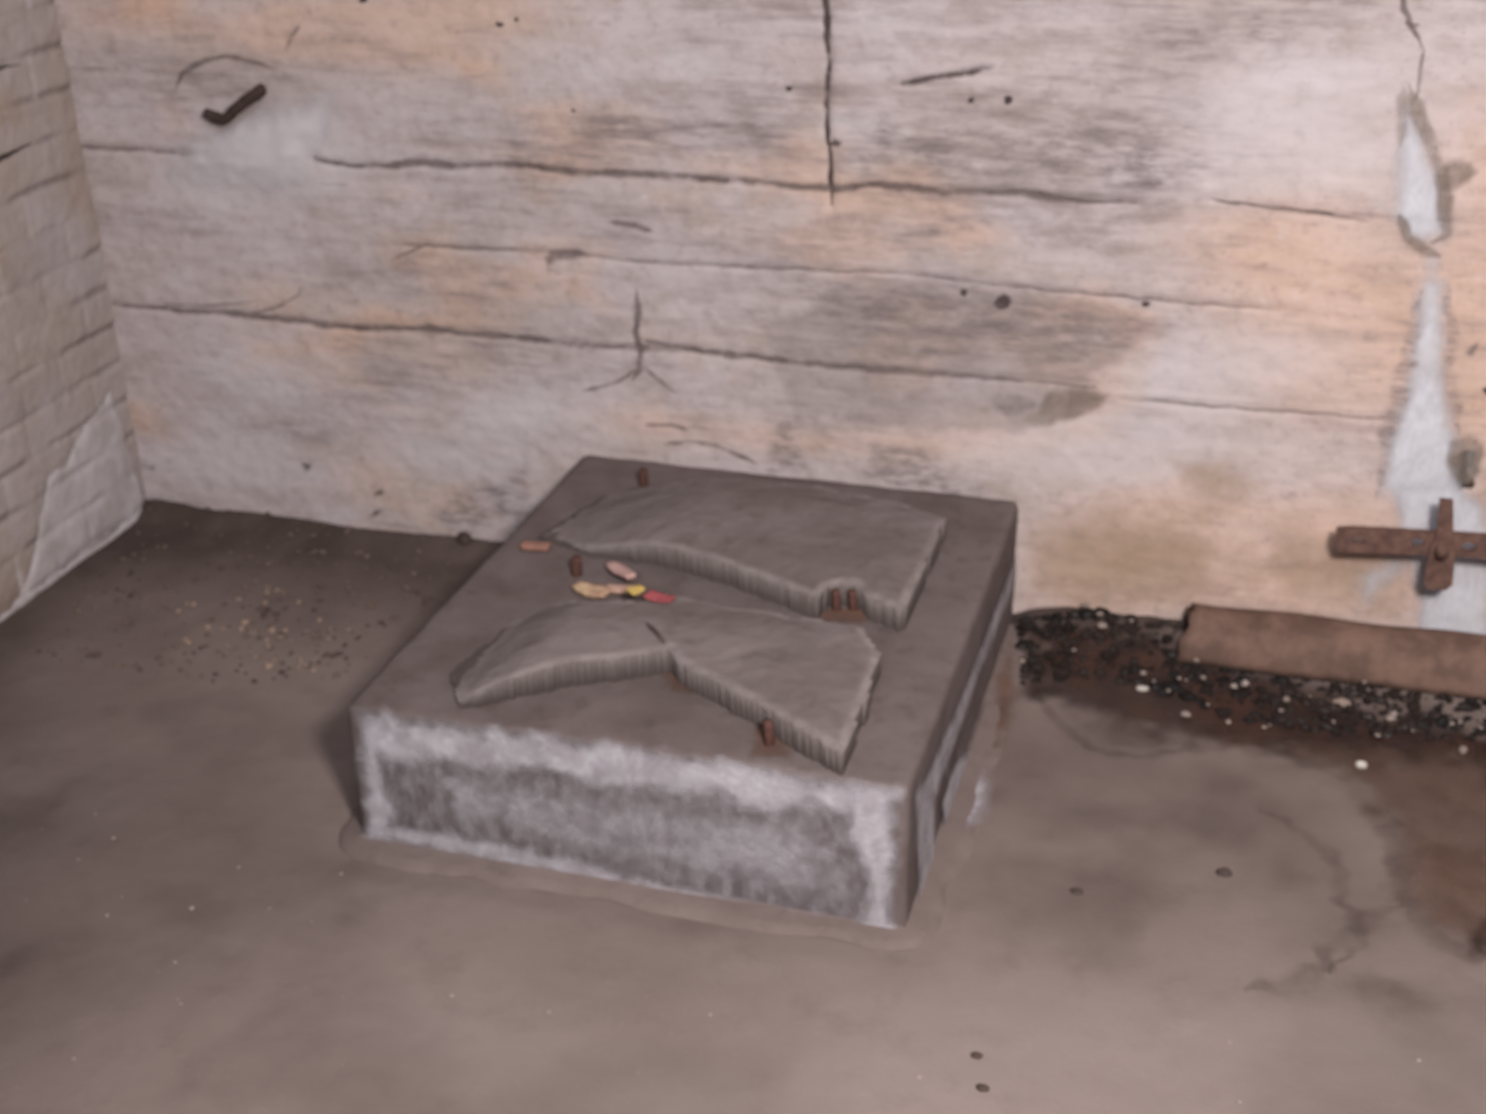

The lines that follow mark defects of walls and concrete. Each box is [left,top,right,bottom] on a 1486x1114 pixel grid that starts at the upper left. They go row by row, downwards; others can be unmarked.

crack [313,0,1136,205]
damp [1399,103,1472,248]
crack [123,304,549,343]
crack [552,250,582,258]
crack [585,225,679,391]
crack [688,347,1097,388]
crack [1101,292,1153,300]
damp [1380,283,1486,635]
corrosion [1026,628,1486,767]
damp [1348,753,1486,945]